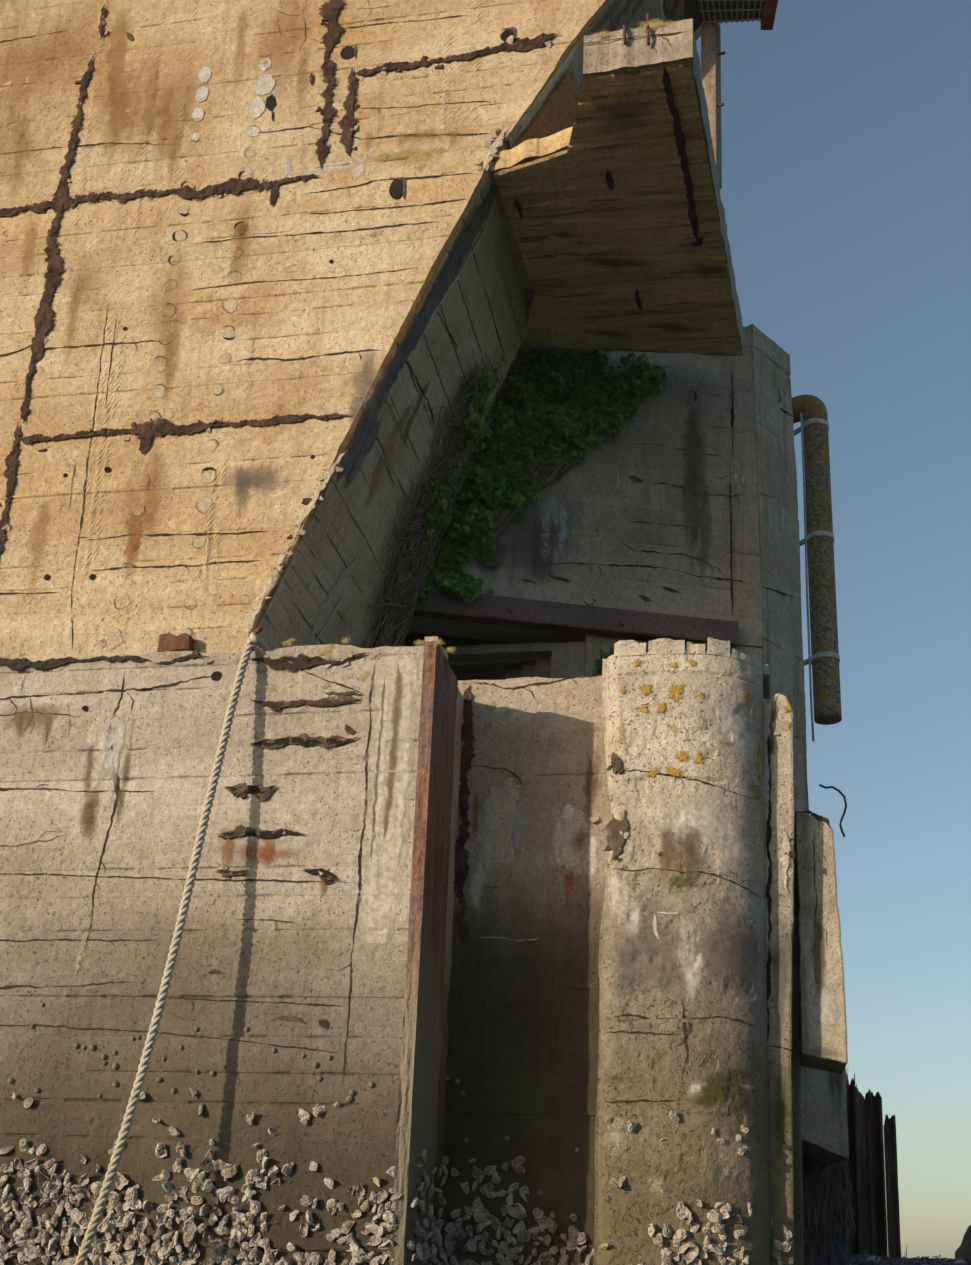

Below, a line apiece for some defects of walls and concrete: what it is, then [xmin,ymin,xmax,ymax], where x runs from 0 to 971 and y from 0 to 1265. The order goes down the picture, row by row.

crack [346,0,471,28]
crack [0,29,70,42]
crack [2,139,200,154]
crack [244,101,491,178]
crack [0,173,467,1077]
spalling [251,691,363,712]
spalling [250,724,357,750]
spalling [224,781,278,802]
spalling [218,825,305,839]
corrosion [246,839,277,860]
water stain [662,802,742,888]
spalling [301,867,337,885]